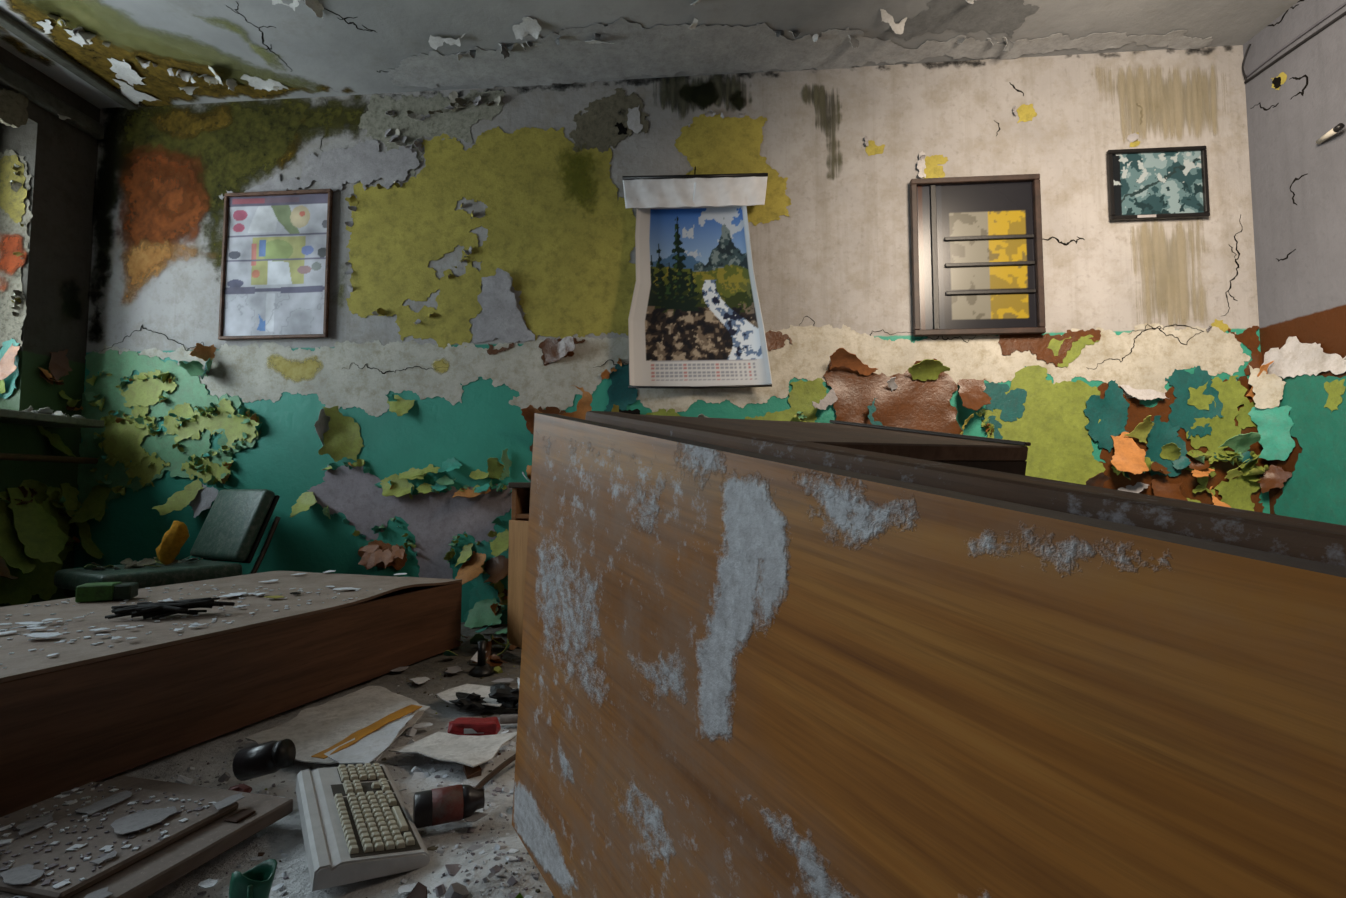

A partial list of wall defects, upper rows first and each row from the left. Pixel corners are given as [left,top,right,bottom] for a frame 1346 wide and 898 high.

crack [227,1,292,72]
crack [324,8,377,33]
damp [628,73,751,117]
damp [803,86,841,178]
crack [1223,215,1242,316]
peeling [0,0,1346,629]